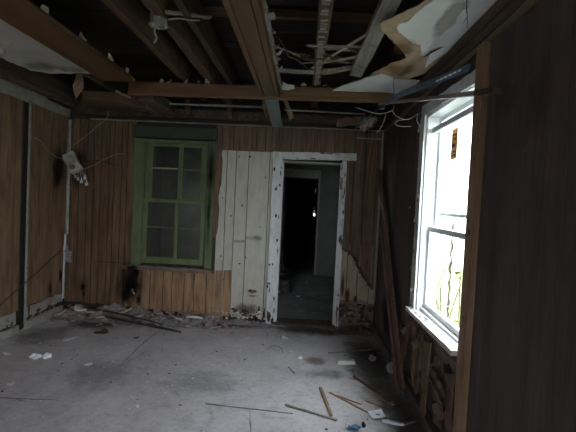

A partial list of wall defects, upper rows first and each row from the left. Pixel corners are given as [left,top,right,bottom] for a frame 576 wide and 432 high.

leakage [122,265,141,303]
spalling [334,289,375,328]